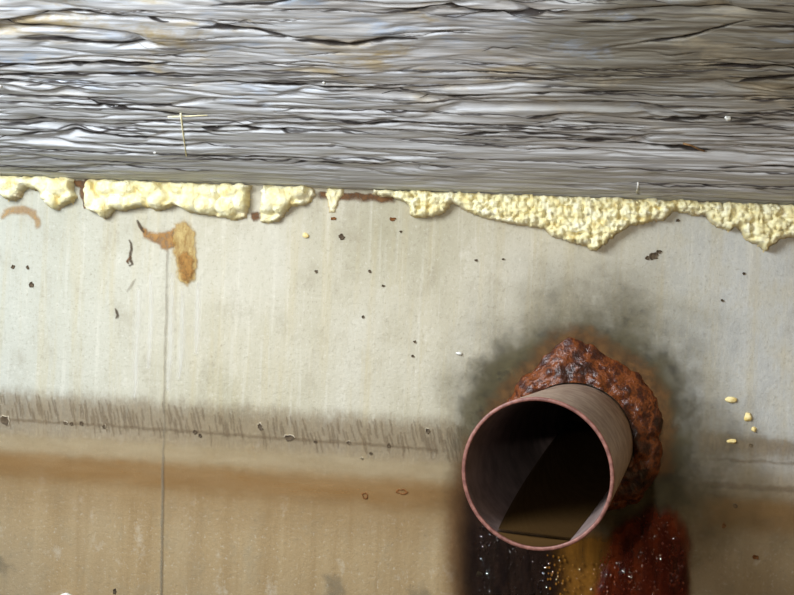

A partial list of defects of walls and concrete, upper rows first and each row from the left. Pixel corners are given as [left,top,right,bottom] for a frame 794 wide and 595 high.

water stain [2,207,40,226]
water stain [74,179,88,209]
water stain [339,192,394,203]
water stain [0,331,565,457]
rust [495,330,669,511]
water stain [575,308,690,520]
water stain [0,455,561,595]
rust [546,506,689,595]